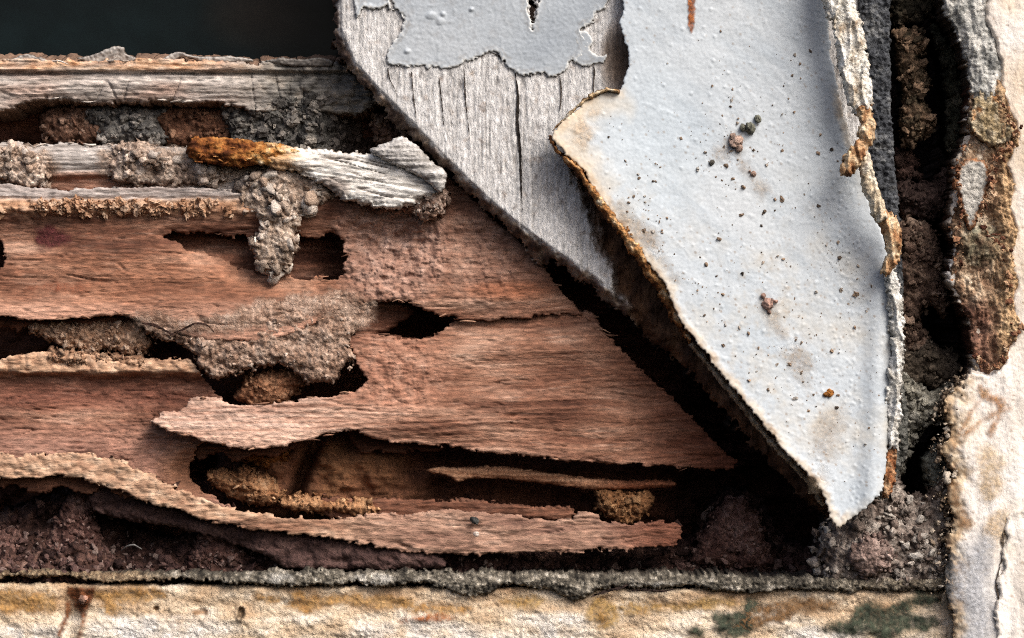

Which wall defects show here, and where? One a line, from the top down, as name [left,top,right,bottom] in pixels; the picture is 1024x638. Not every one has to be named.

peeling [370,136,447,193]
crack [492,53,523,210]
peeling [548,0,906,528]
spalling [932,0,1024,375]
peeling [993,506,1024,638]